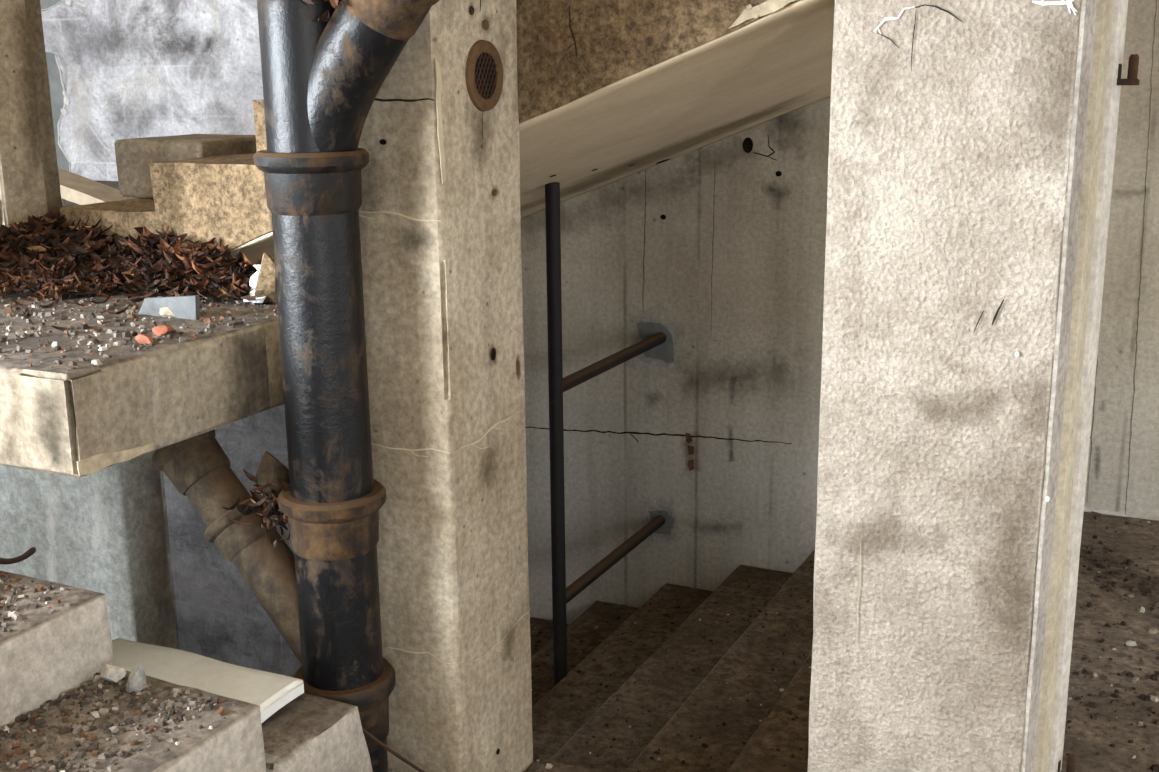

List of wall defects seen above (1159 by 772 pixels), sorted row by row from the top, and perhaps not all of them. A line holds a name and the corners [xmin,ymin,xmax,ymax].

spalling [40,0,85,11]
crack [878,4,962,70]
leakage [43,408,57,453]
crack [525,426,792,444]
corrosion [686,433,694,471]